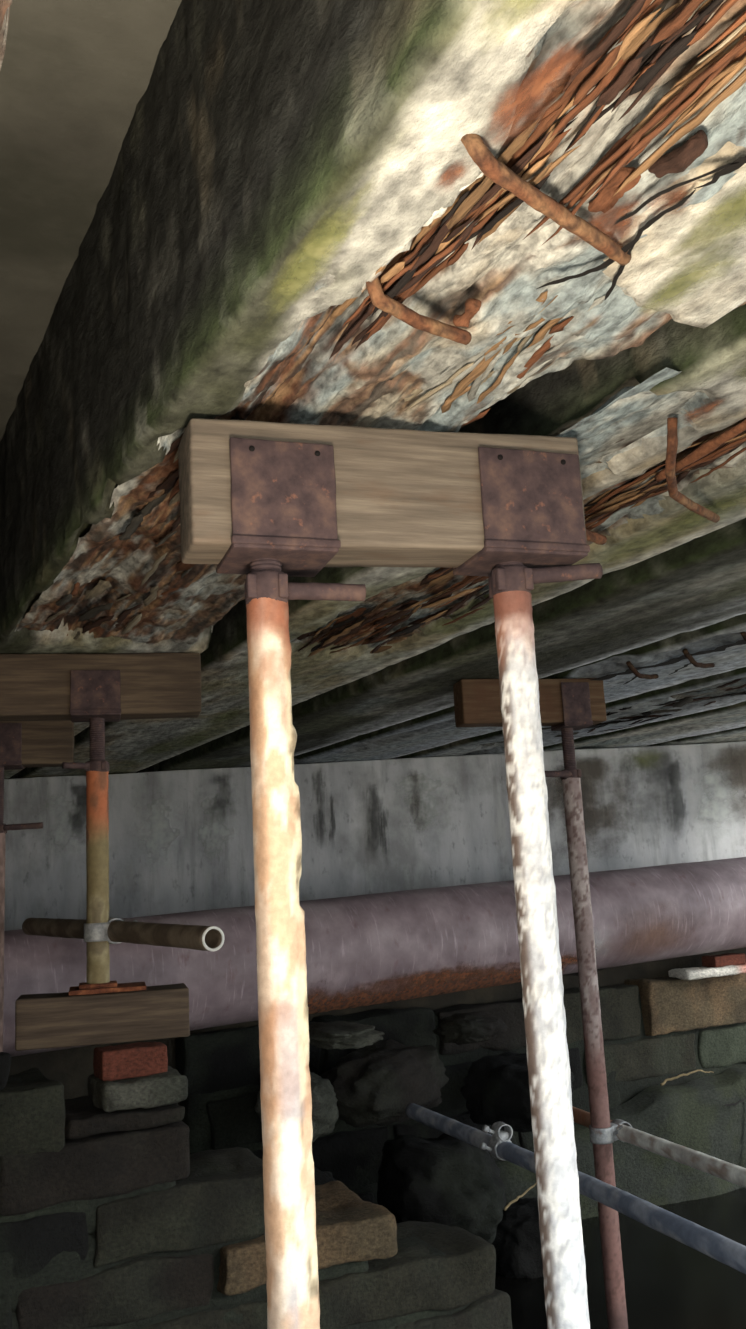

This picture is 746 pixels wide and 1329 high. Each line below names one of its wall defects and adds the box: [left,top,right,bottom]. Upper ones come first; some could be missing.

corrosion [493,0,746,239]
corrosion [329,165,524,359]
spalling [215,0,746,432]
corrosion [524,216,562,245]
crack [537,156,746,300]
spalling [555,367,746,546]
spalling [15,428,246,645]
spalling [290,567,489,648]
water stain [317,774,335,837]
water stain [546,777,565,815]
water stain [576,758,626,835]
water stain [652,747,746,827]